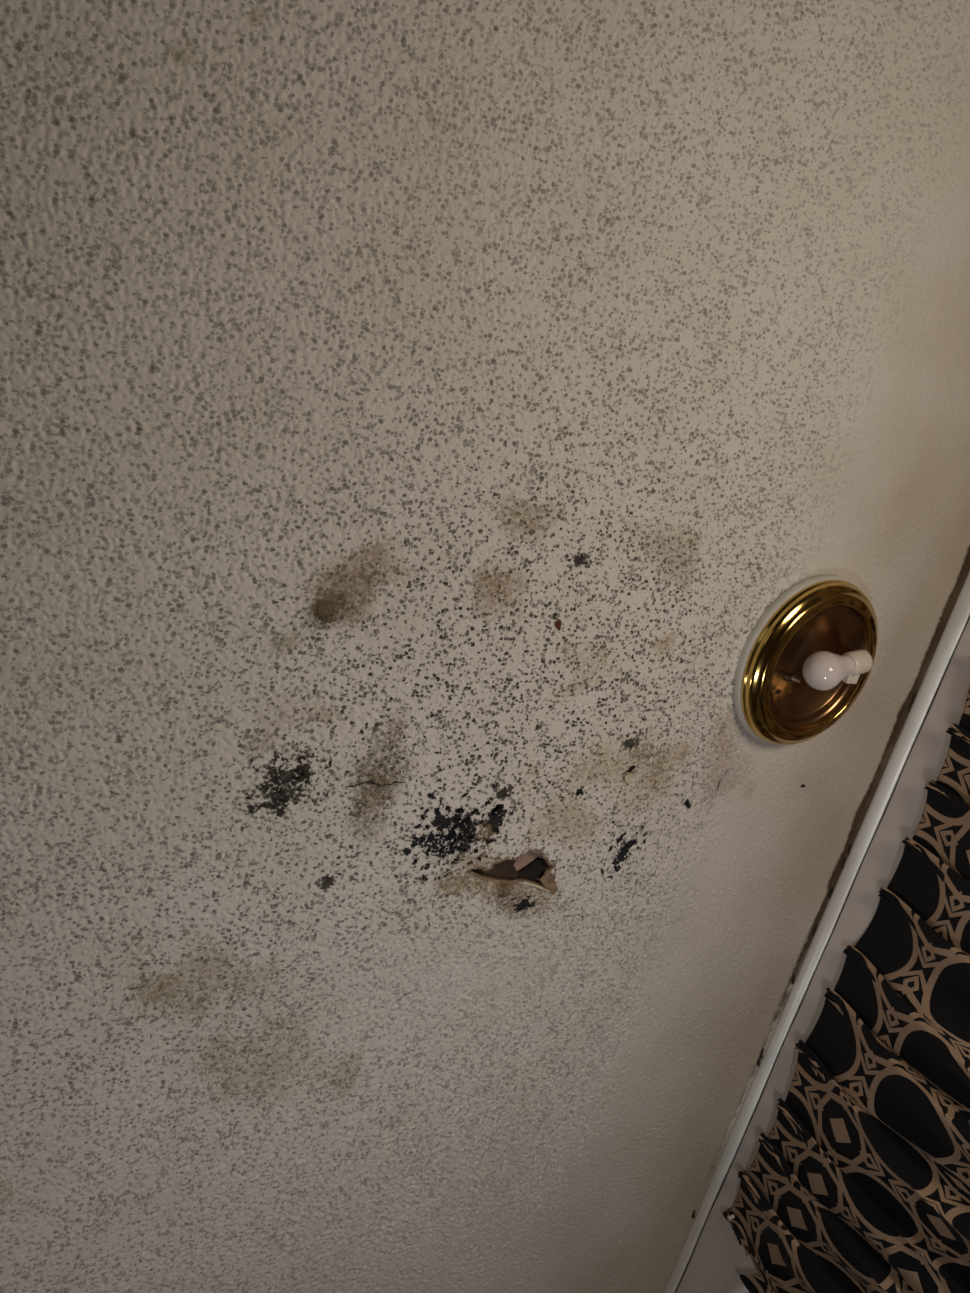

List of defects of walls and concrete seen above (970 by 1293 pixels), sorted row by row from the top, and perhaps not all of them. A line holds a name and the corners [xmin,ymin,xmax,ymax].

mould [232,738,335,831]
mould [400,780,514,881]
mould [594,825,647,880]